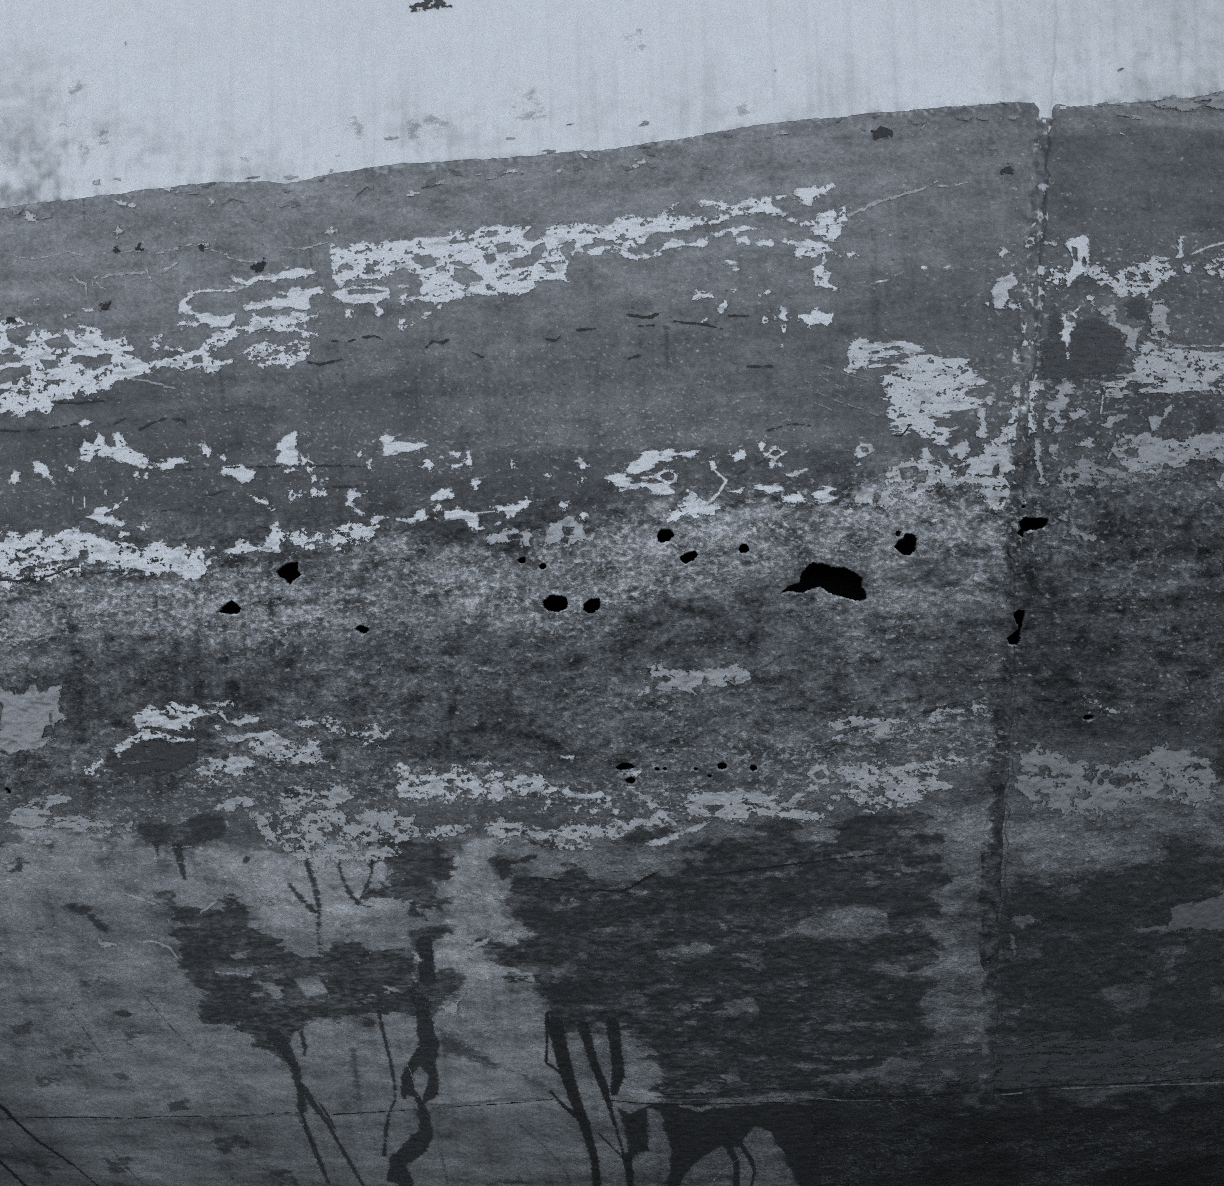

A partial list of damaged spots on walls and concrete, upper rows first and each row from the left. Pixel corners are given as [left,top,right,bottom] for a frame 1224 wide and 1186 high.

peeling [0,175,863,418]
peeling [604,222,1224,549]
peeling [6,419,189,485]
peeling [274,430,330,504]
peeling [0,443,595,591]
spalling [782,562,866,601]
damp [505,828,565,849]
damp [623,827,675,844]
damp [494,859,510,880]
damp [168,1100,189,1111]
crack [7,1099,552,1119]
crack [602,1077,1224,1105]